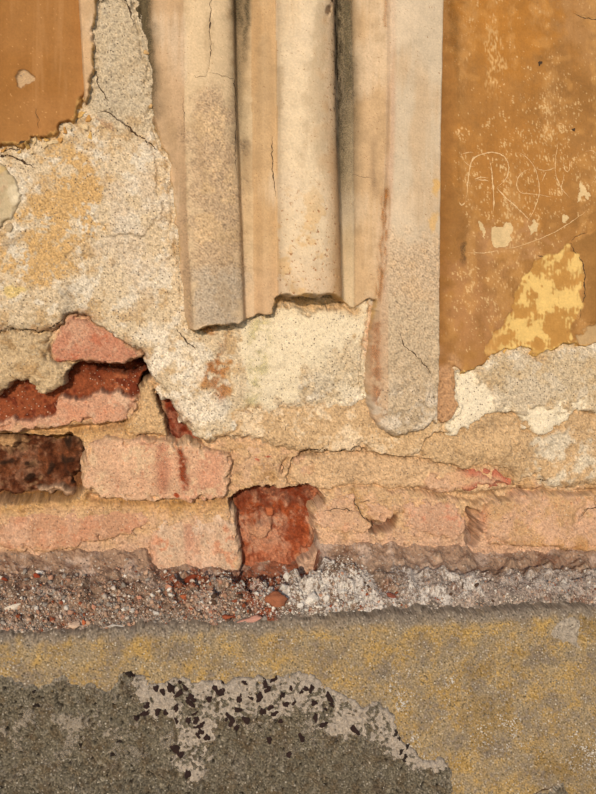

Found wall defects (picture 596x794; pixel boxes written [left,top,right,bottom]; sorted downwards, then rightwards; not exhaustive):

crack [96,75,158,151]
crack [194,0,237,169]
spalling [0,0,373,443]
peeling [478,221,513,248]
peeling [577,183,591,202]
spalling [444,244,596,436]
spalling [0,432,85,496]
spalling [231,483,318,567]
peeling [0,671,448,788]